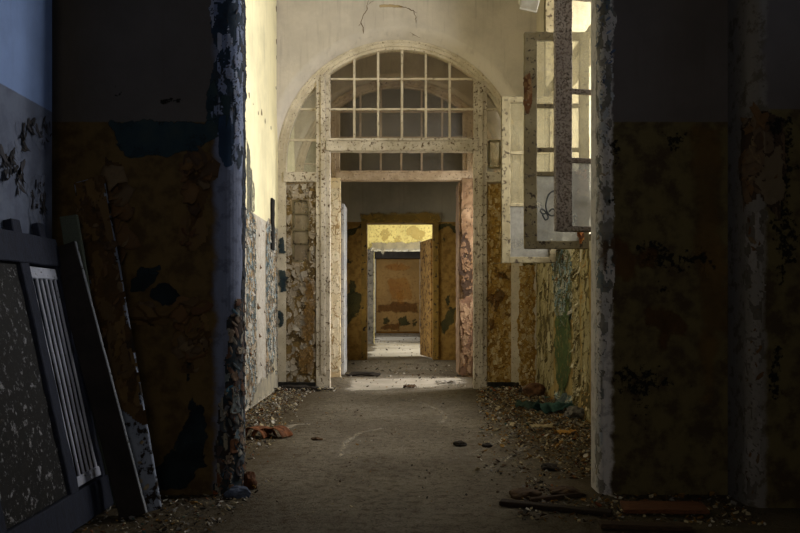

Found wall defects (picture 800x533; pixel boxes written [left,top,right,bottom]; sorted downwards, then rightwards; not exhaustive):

crack [360,0,420,38]
peeling [0,114,52,228]
peeling [206,0,316,495]
peeling [487,0,617,494]
peeling [459,296,473,375]